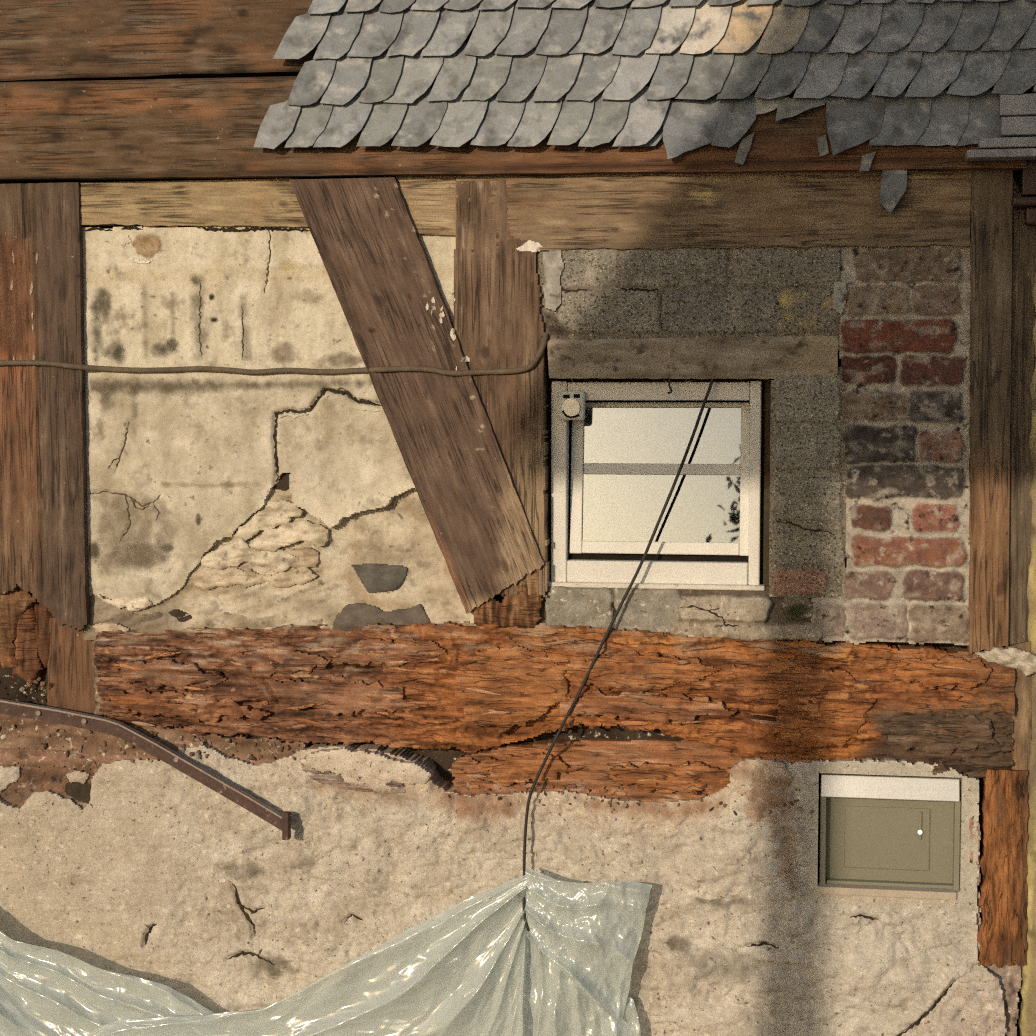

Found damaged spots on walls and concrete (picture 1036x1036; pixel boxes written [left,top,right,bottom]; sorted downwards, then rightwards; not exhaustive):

crack [85,224,141,232]
crack [192,225,309,293]
crack [196,280,204,354]
crack [273,388,380,482]
crack [90,421,161,542]
flaking render [83,473,474,640]
flaking render [0,747,98,809]
crack [145,924,156,945]
crack [228,884,274,965]
crack [897,980,955,1036]